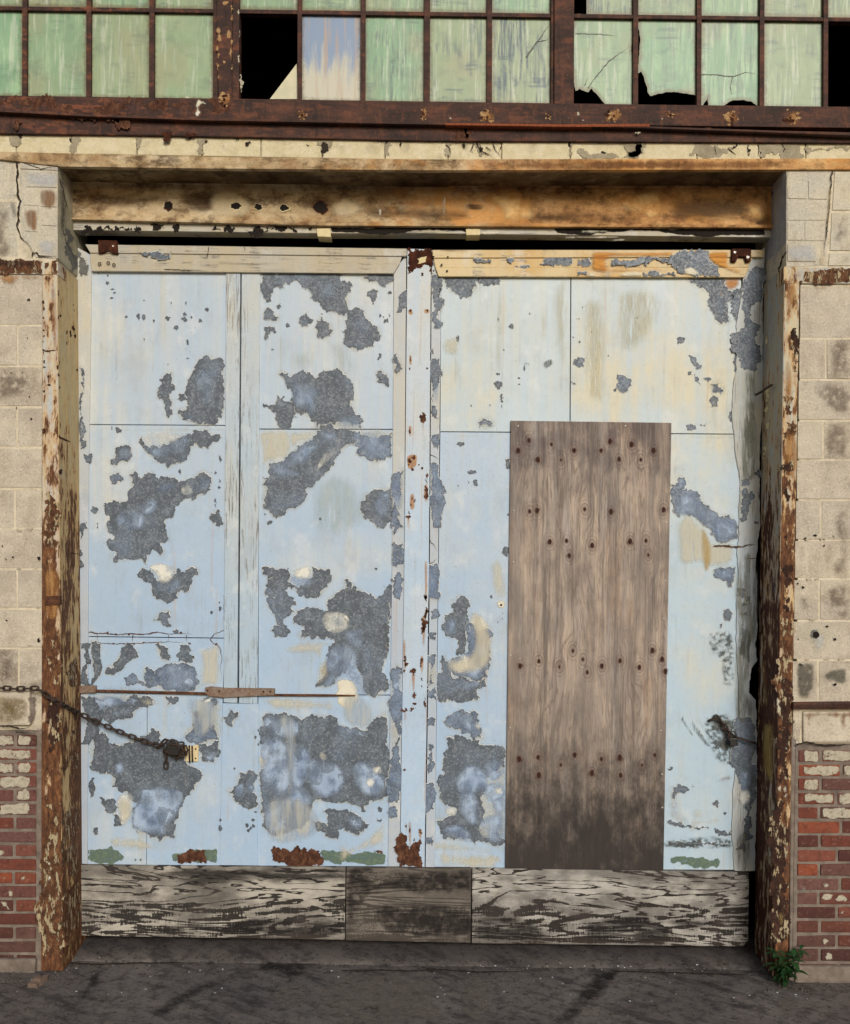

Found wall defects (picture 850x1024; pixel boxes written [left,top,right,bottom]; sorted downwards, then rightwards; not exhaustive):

crack [14,162,73,258]
peeling [331,227,468,235]
peeling [555,229,768,372]
peeling [262,368,393,525]
peeling [670,446,767,543]
peeling [79,355,239,842]
peeling [226,470,404,839]
rust [771,564,813,784]
rust [33,803,82,957]
rust [177,849,207,864]
rust [271,846,324,866]
rust [373,825,423,867]